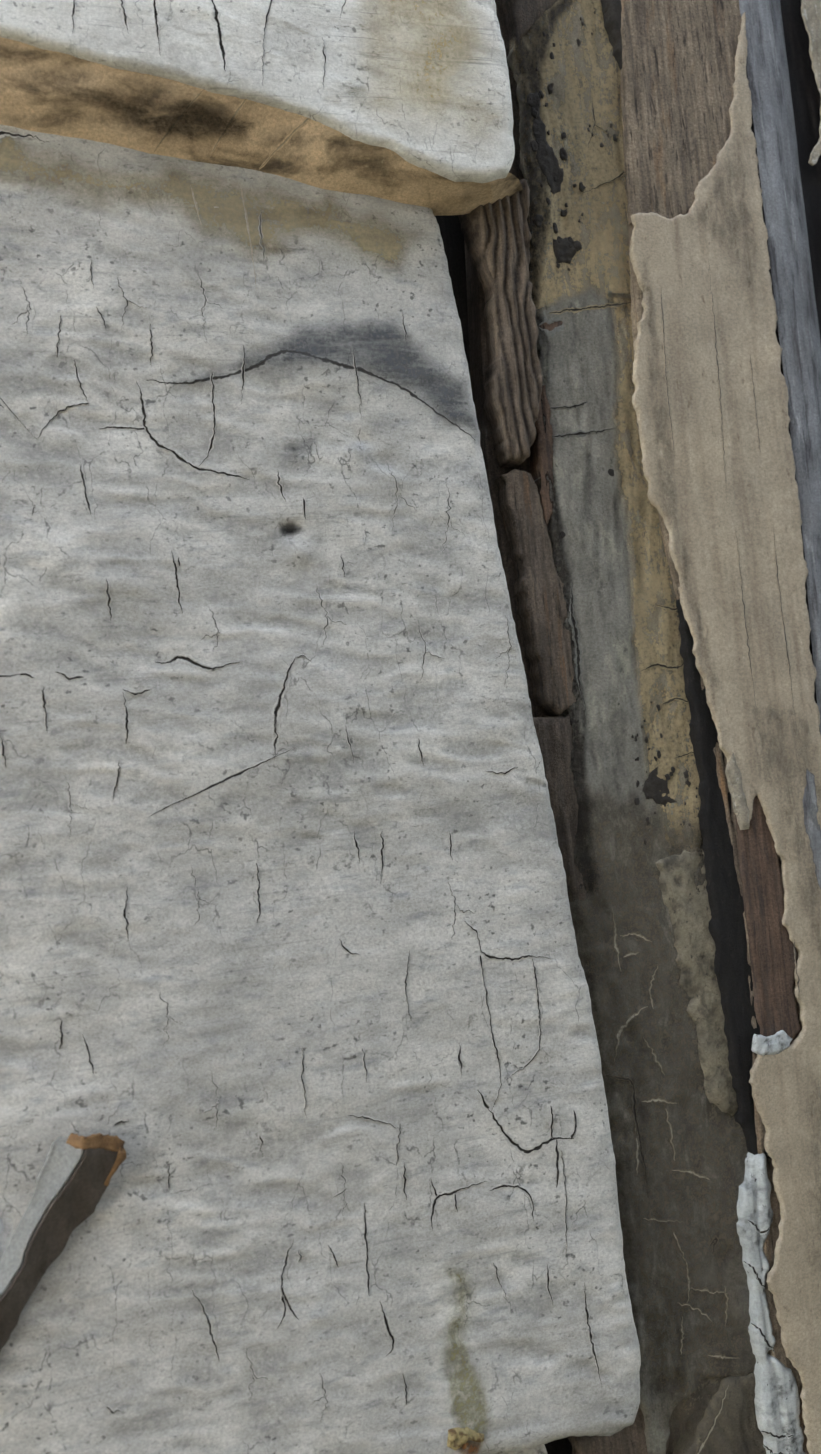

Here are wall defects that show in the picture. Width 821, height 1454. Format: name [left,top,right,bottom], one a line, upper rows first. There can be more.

crack [118,0,161,56]
crack [209,0,273,85]
peeling [621,0,742,225]
crack [12,259,306,519]
crack [0,671,84,732]
crack [65,550,242,838]
crack [271,555,347,760]
peeling [725,753,801,1056]
peeling [803,769,821,888]
crack [277,1161,408,1405]
crack [348,831,602,1387]
crack [606,910,774,1454]